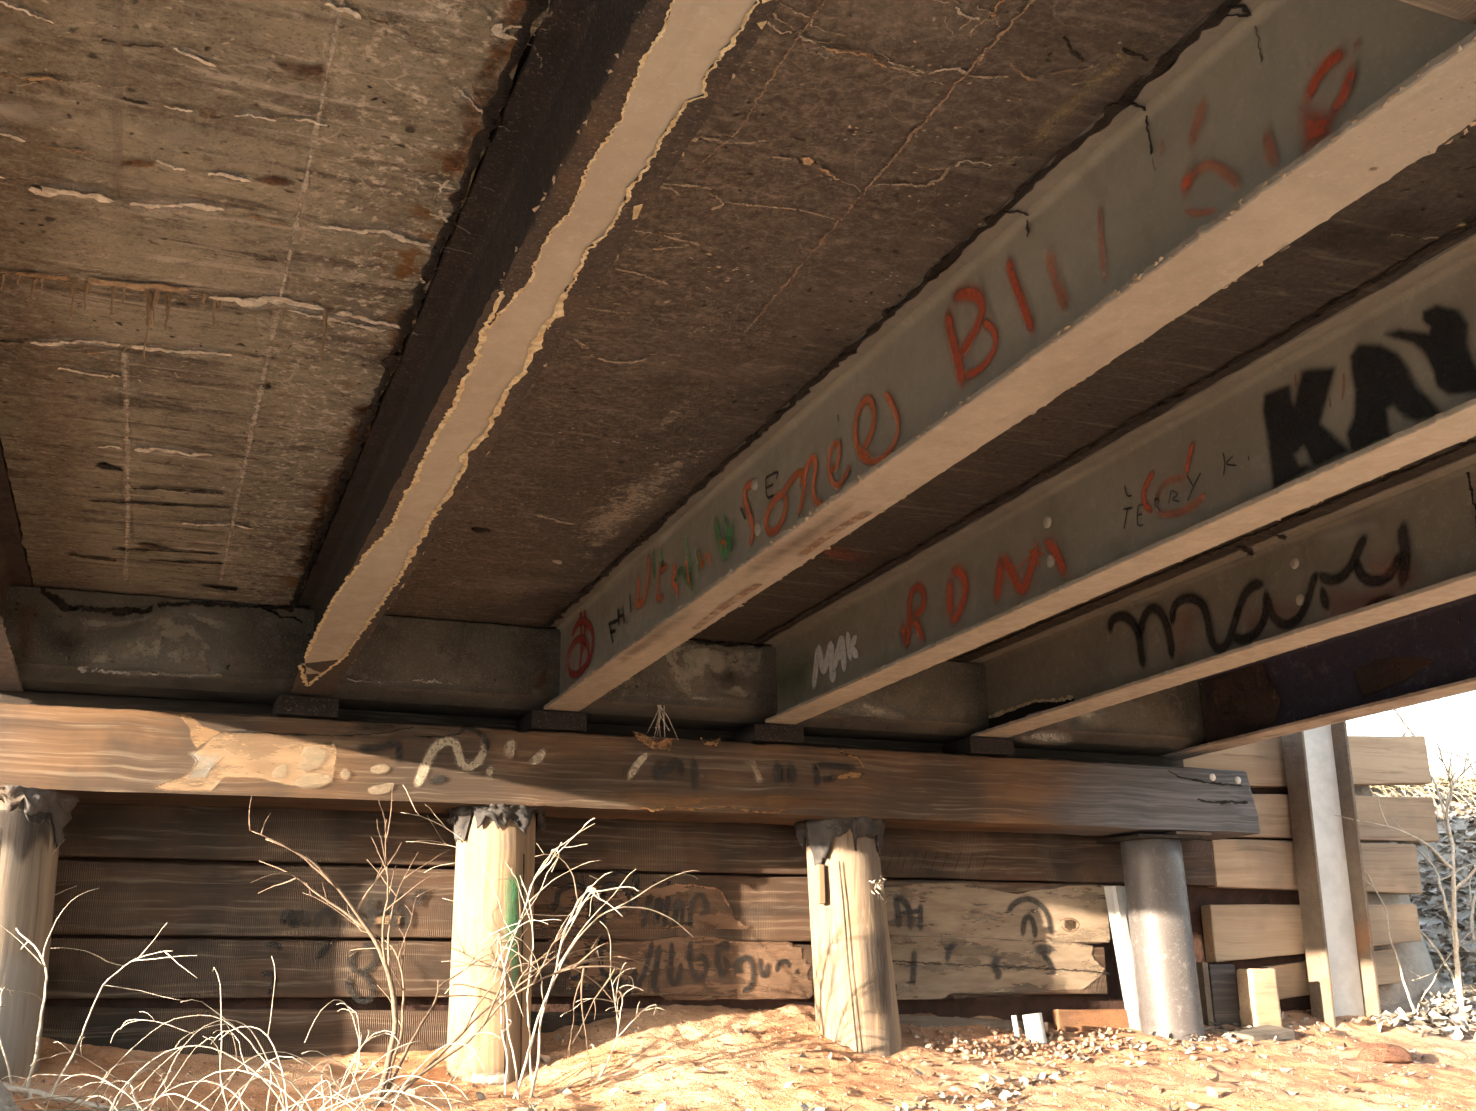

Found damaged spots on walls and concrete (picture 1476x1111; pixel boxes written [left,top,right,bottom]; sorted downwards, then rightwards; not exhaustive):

crack [0,0,375,129]
crack [324,0,450,57]
corrosion [444,43,505,173]
water stain [465,0,553,68]
crack [767,3,1149,85]
crack [0,128,472,254]
water stain [395,160,502,234]
crack [661,136,1022,220]
peeling [40,0,780,692]
water stain [97,353,131,580]
water stain [218,311,280,581]
corrosion [296,408,367,566]